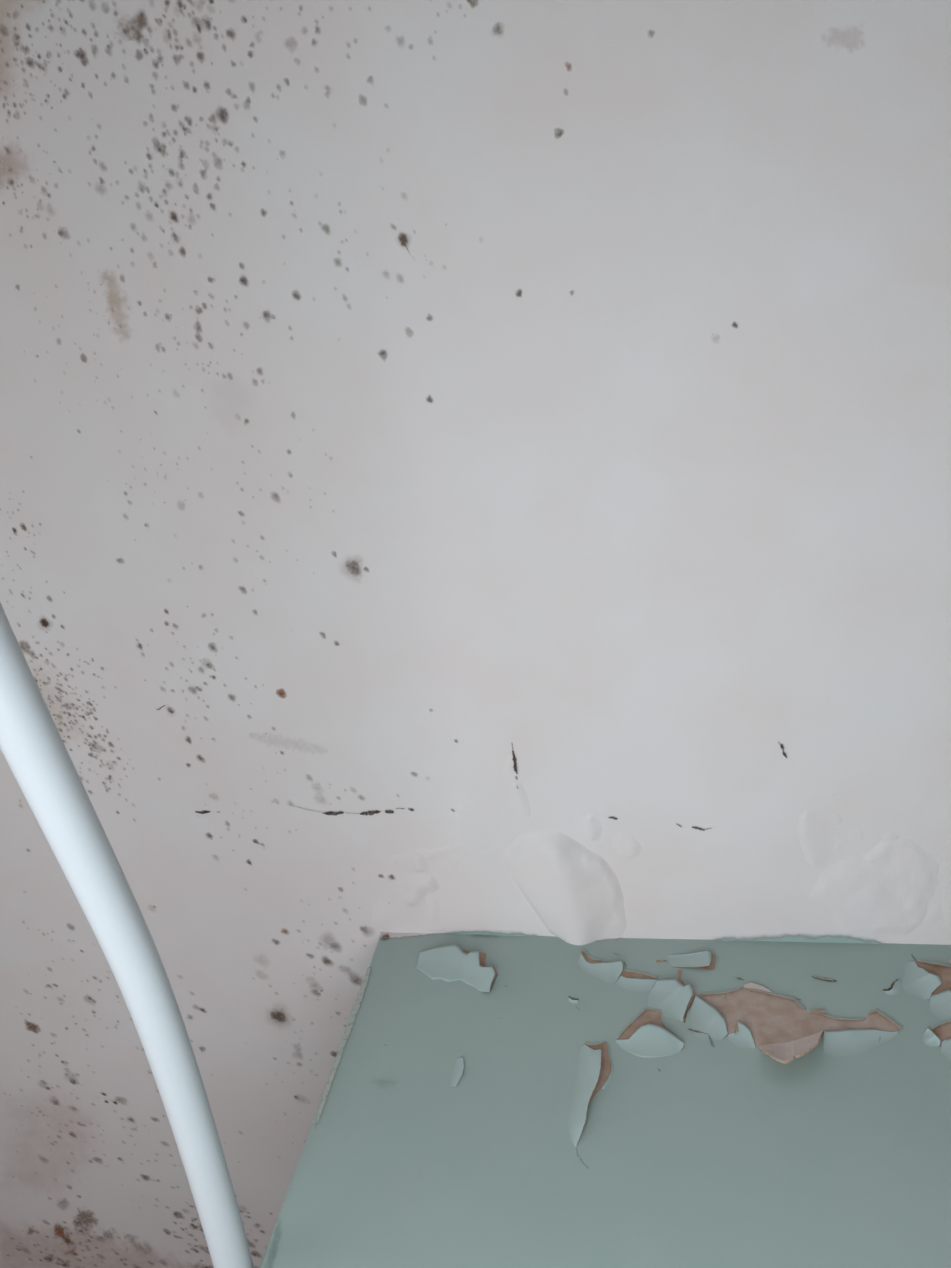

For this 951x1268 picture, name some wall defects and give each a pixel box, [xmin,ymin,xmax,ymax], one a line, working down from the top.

peeling [416,944,497,992]
peeling [568,947,903,1146]
peeling [883,954,951,1060]
damp [74,1212,96,1232]